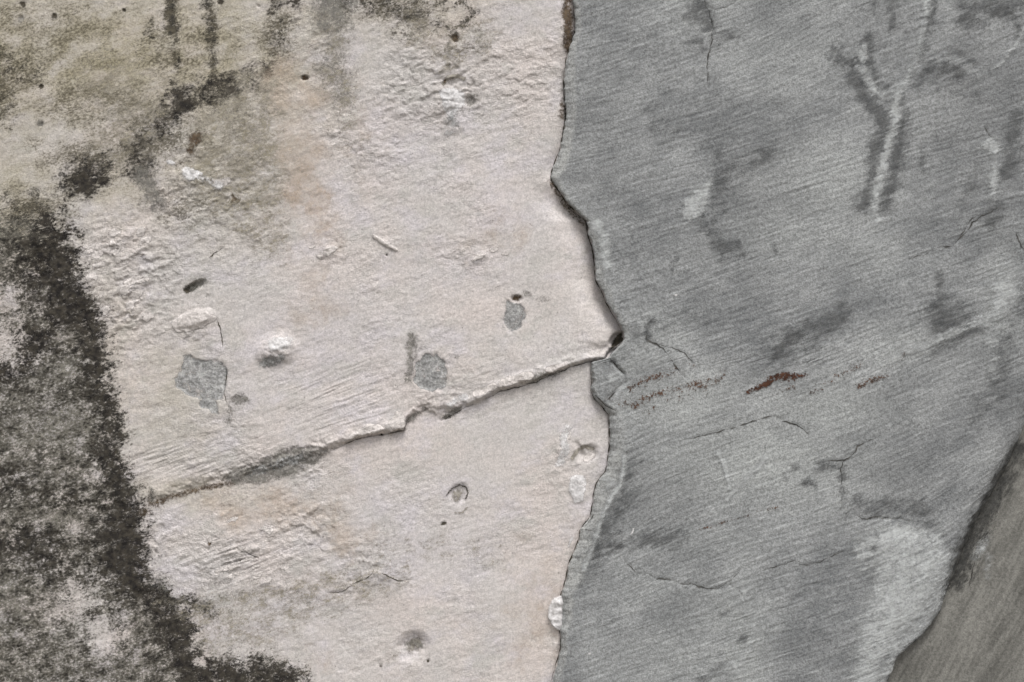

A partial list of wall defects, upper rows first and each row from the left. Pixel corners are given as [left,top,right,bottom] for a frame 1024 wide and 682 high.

spalling [504,291,531,331]
spalling [175,354,250,423]
damp [0,0,500,682]
spalling [405,333,456,392]
rust [609,367,726,414]
rust [746,372,808,395]
rust [810,353,906,394]
spalling [571,445,596,462]